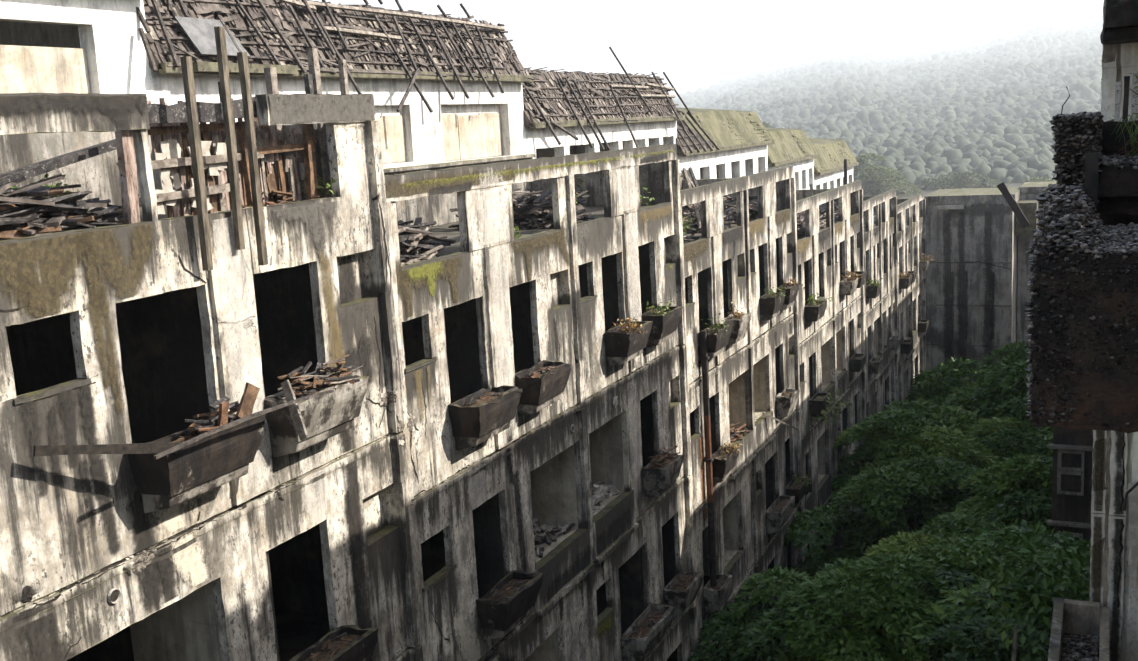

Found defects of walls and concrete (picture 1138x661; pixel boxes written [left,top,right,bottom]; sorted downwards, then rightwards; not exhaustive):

damp [385,166,516,198]
damp [0,223,153,413]
damp [395,257,462,317]
damp [922,204,1011,370]
damp [21,385,121,554]
damp [128,490,178,614]
damp [507,422,526,572]
rust [700,415,714,519]
damp [14,583,79,661]